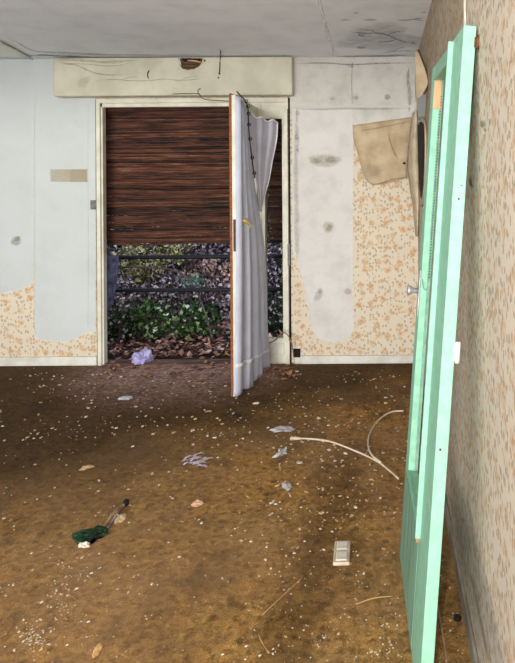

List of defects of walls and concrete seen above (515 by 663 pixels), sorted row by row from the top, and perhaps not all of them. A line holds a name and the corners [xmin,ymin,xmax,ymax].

spalling [178,58,203,70]